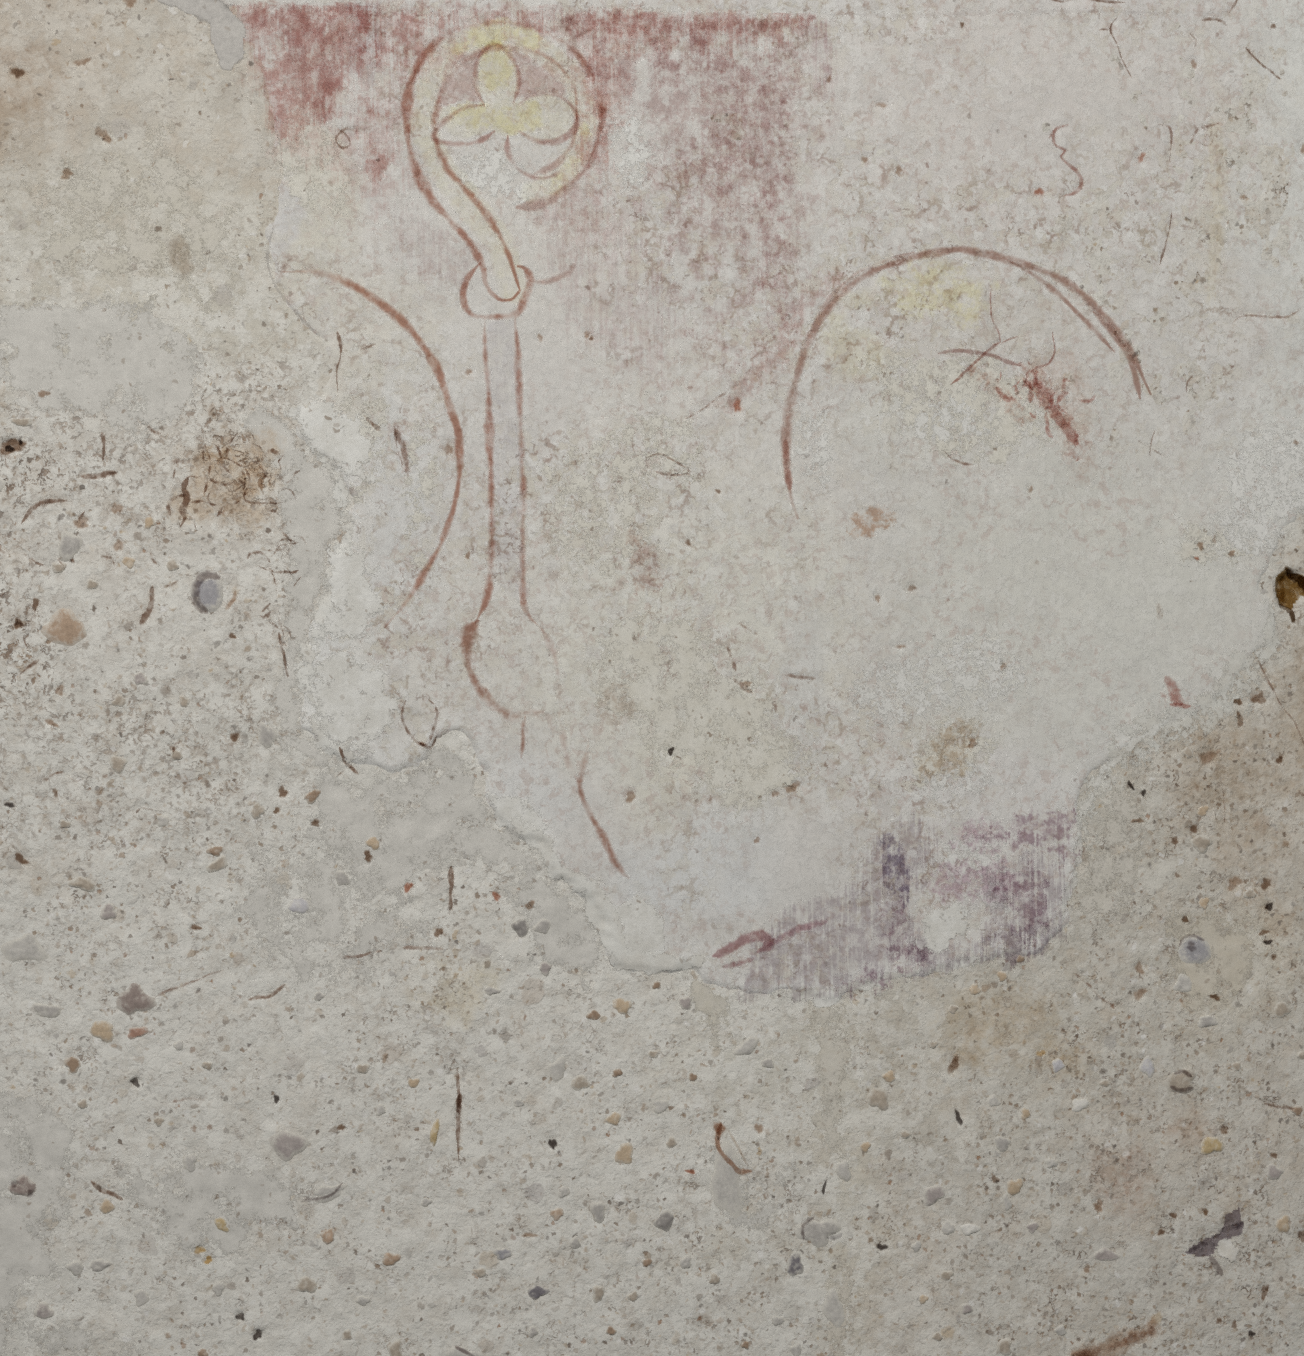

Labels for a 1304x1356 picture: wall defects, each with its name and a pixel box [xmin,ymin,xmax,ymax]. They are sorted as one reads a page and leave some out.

peeling [264,119,357,216]
spalling [0,439,26,454]
peeling [866,352,1065,469]
flaking render [284,399,401,768]
peeling [1165,521,1254,569]
spalling [1276,568,1304,622]
peeling [586,610,814,818]
flaking render [772,703,1196,1008]
spalling [1215,1238,1239,1262]